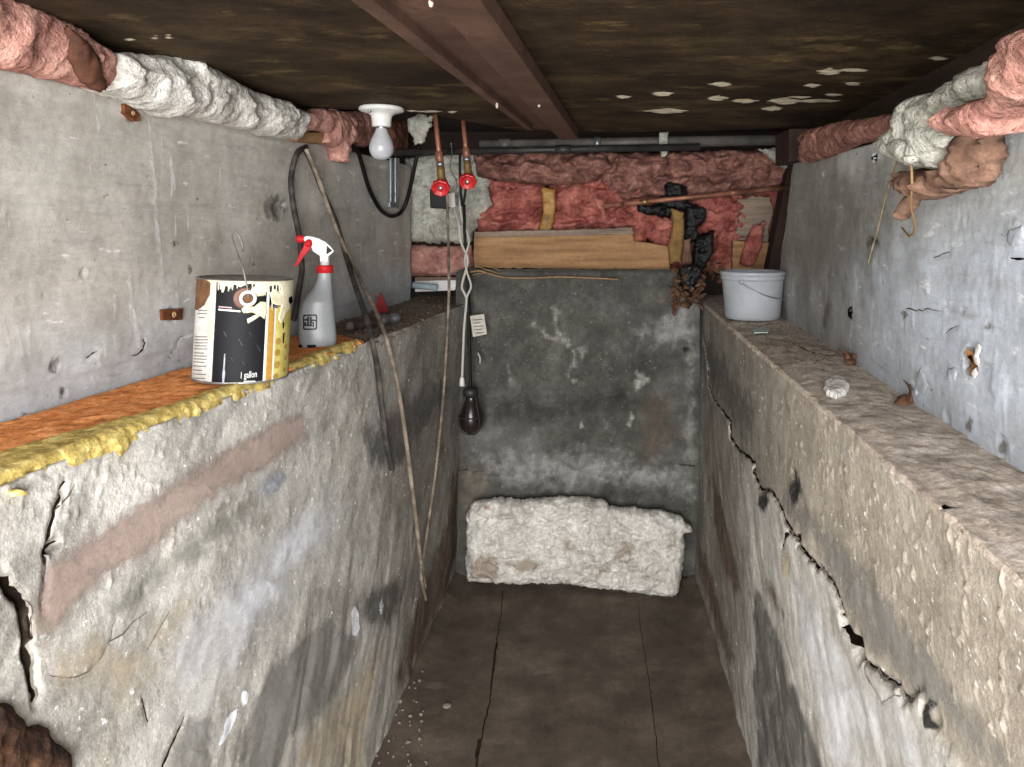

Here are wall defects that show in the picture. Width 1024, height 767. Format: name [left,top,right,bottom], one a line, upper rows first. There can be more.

water stain [635,373,649,389]
spalling [964,343,981,379]
crack [0,481,170,702]
crack [703,337,920,706]
crack [475,592,503,767]